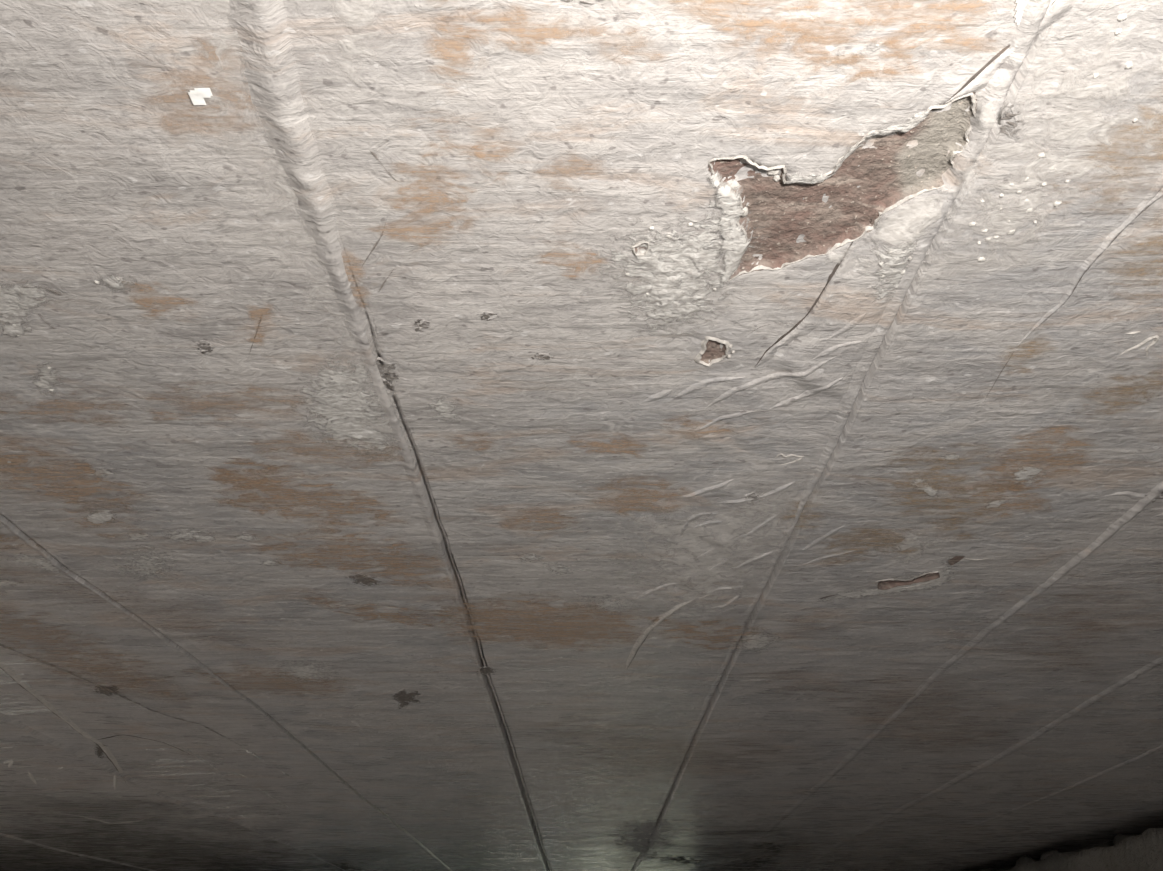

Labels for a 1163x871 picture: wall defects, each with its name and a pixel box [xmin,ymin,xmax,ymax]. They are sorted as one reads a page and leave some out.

crack [755,241,862,368]
peeling [596,14,1153,367]
crack [995,172,1163,382]
spalling [817,556,996,602]